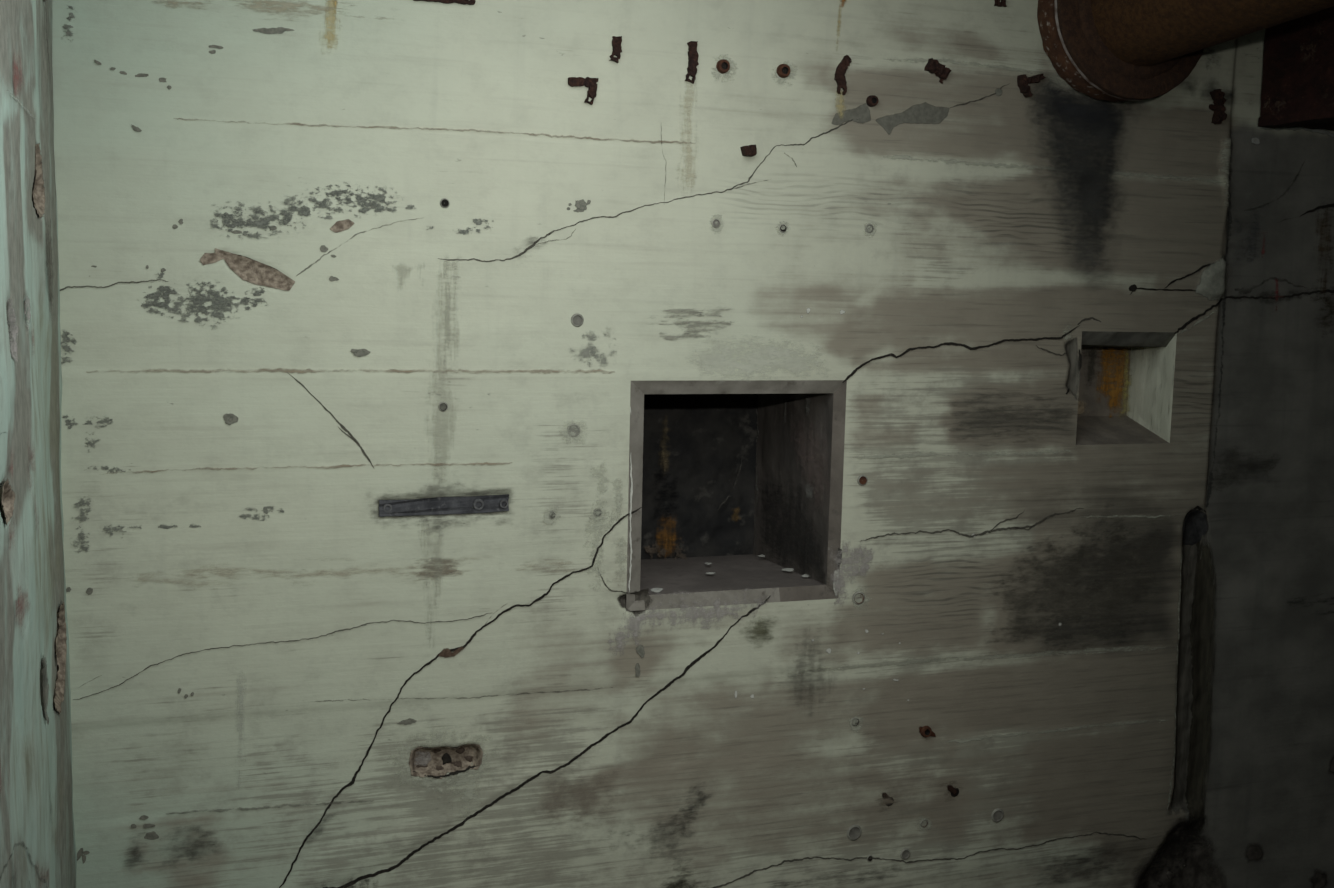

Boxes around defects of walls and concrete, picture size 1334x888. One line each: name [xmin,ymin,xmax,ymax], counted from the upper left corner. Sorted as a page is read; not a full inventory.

crack [950,85,1006,108]
spalling [141,185,414,326]
peeling [459,219,493,235]
crack [438,119,858,262]
crack [1129,263,1334,334]
crack [842,317,1101,383]
crack [861,508,1084,541]
spalling [40,587,93,724]
crack [73,506,643,888]
spalling [393,718,486,809]
crack [323,595,771,888]
crack [712,832,1145,888]